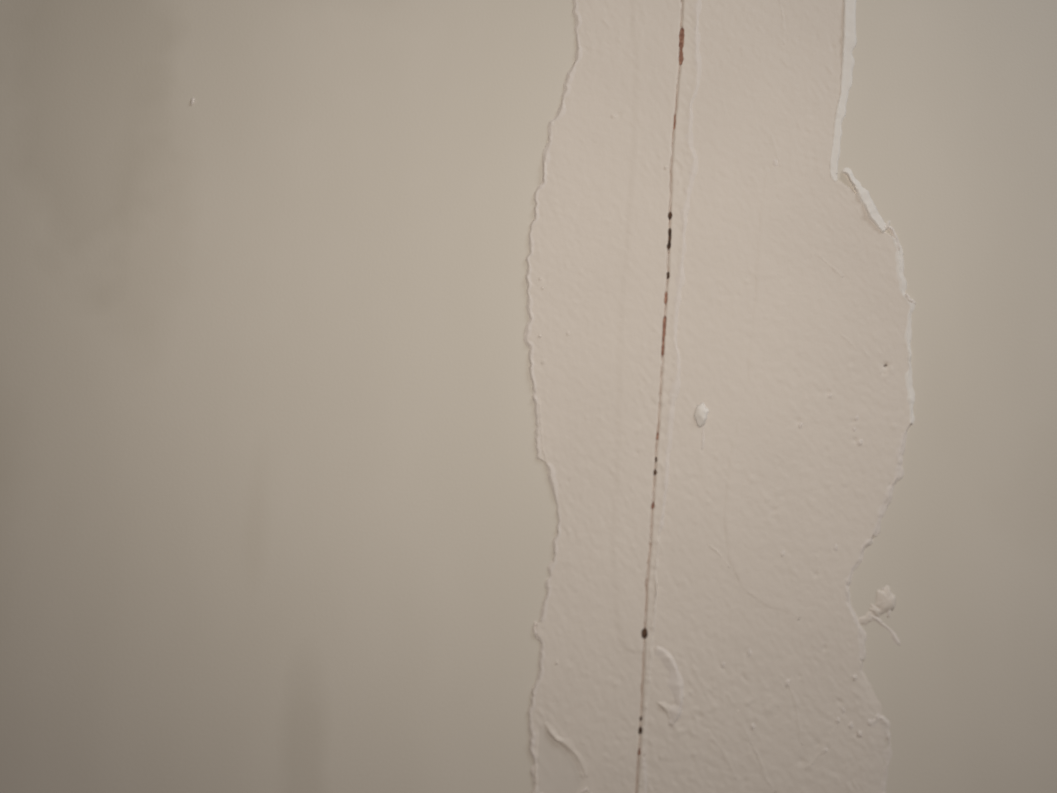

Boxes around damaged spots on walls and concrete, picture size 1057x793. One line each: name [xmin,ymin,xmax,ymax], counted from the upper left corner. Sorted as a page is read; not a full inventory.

crack [664,65,681,316]
peeling [830,0,901,251]
crack [635,355,664,793]